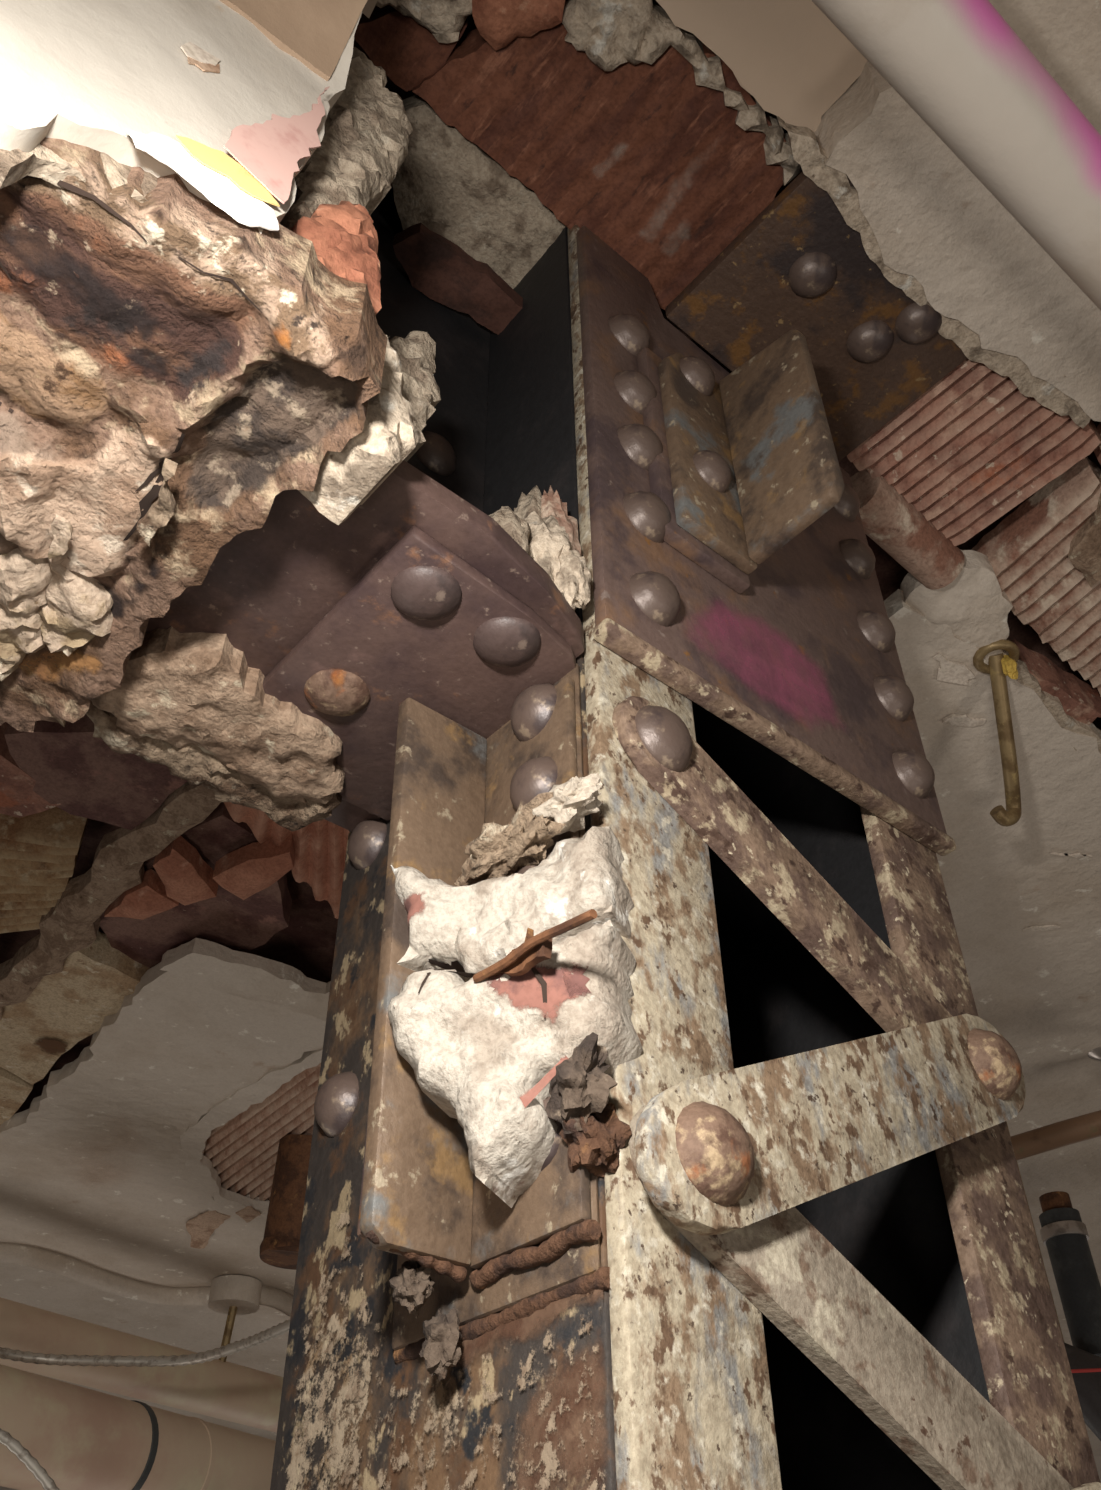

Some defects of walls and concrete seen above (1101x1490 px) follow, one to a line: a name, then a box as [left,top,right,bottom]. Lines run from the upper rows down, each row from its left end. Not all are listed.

peeling [125,86,330,231]
crack [22,175,262,313]
spalling [48,514,74,559]
spalling [99,458,178,618]
flaking render [1003,650,1101,752]
spalling [180,1048,323,1249]
rust [559,1103,632,1178]
rust [365,1219,610,1381]
rust [514,1347,606,1490]